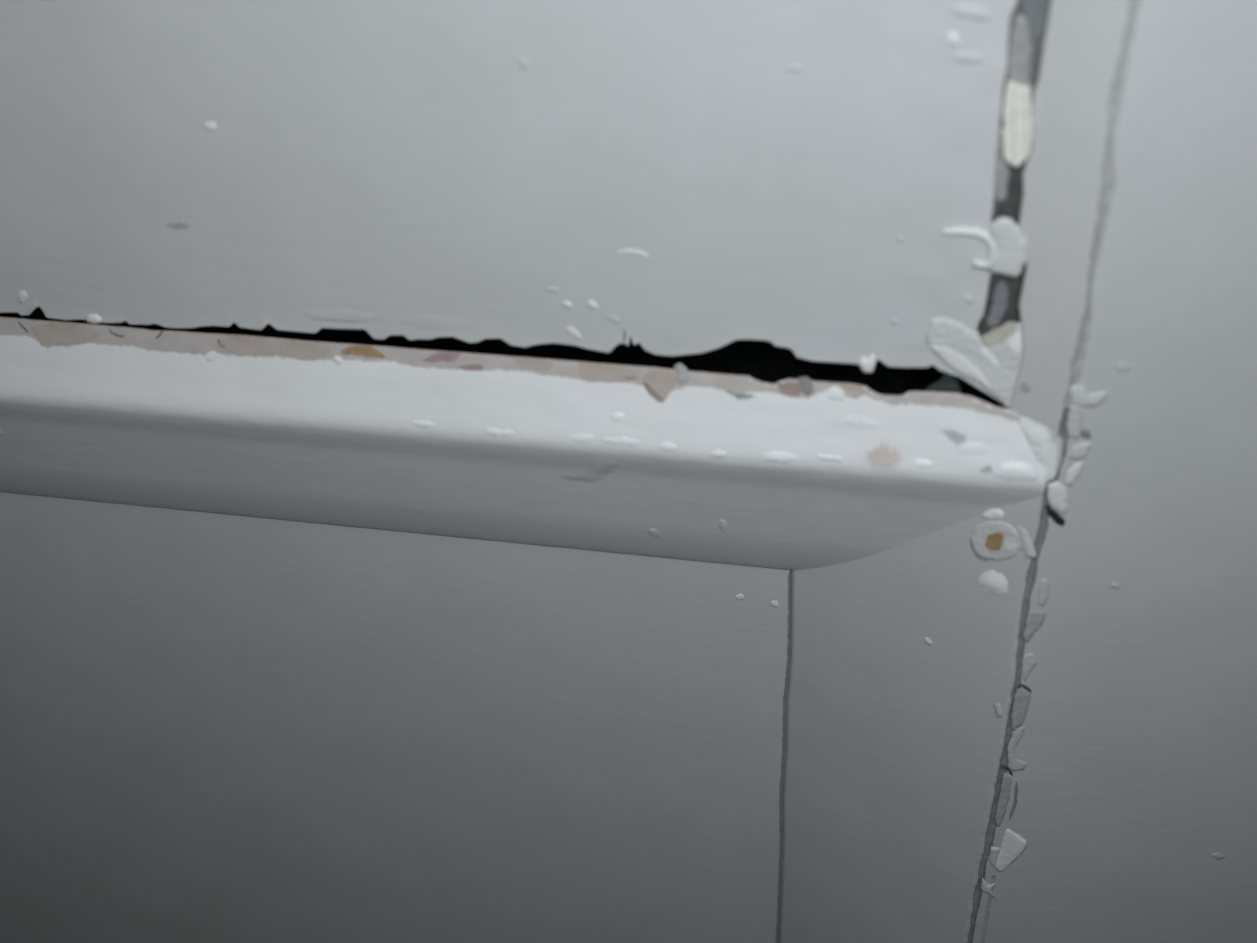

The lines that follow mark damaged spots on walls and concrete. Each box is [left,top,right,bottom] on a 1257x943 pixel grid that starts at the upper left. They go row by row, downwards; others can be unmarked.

peeling [942,216,1027,277]
crack [0,307,1000,407]
spalling [0,314,1023,423]
crack [967,0,1139,943]
spalling [970,509,1037,562]
crack [776,573,791,943]
peeling [981,829,1027,900]